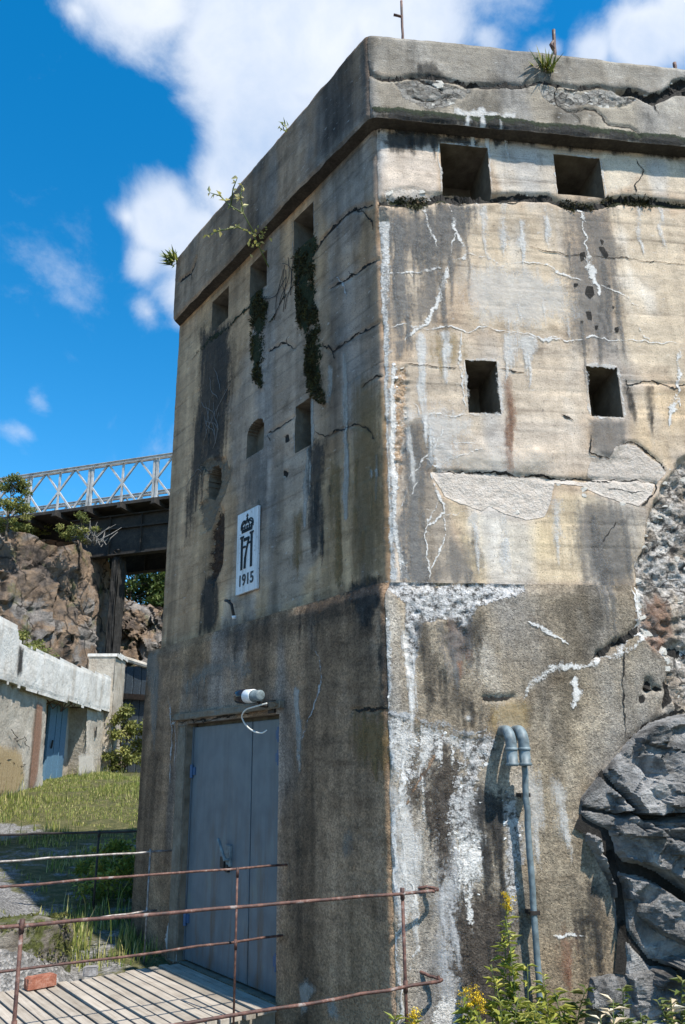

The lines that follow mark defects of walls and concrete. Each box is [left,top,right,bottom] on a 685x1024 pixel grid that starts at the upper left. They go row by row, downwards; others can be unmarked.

spalling [394,79,471,109]
spalling [539,78,685,108]
water stain [186,320,232,529]
crack [195,286,295,356]
spalling [379,222,525,673]
crack [315,75,685,578]
efflorescence [504,335,537,384]
water stain [566,210,625,371]
water stain [199,576,218,635]
spalling [431,444,685,710]
crack [483,587,685,739]
water stain [390,737,519,1024]